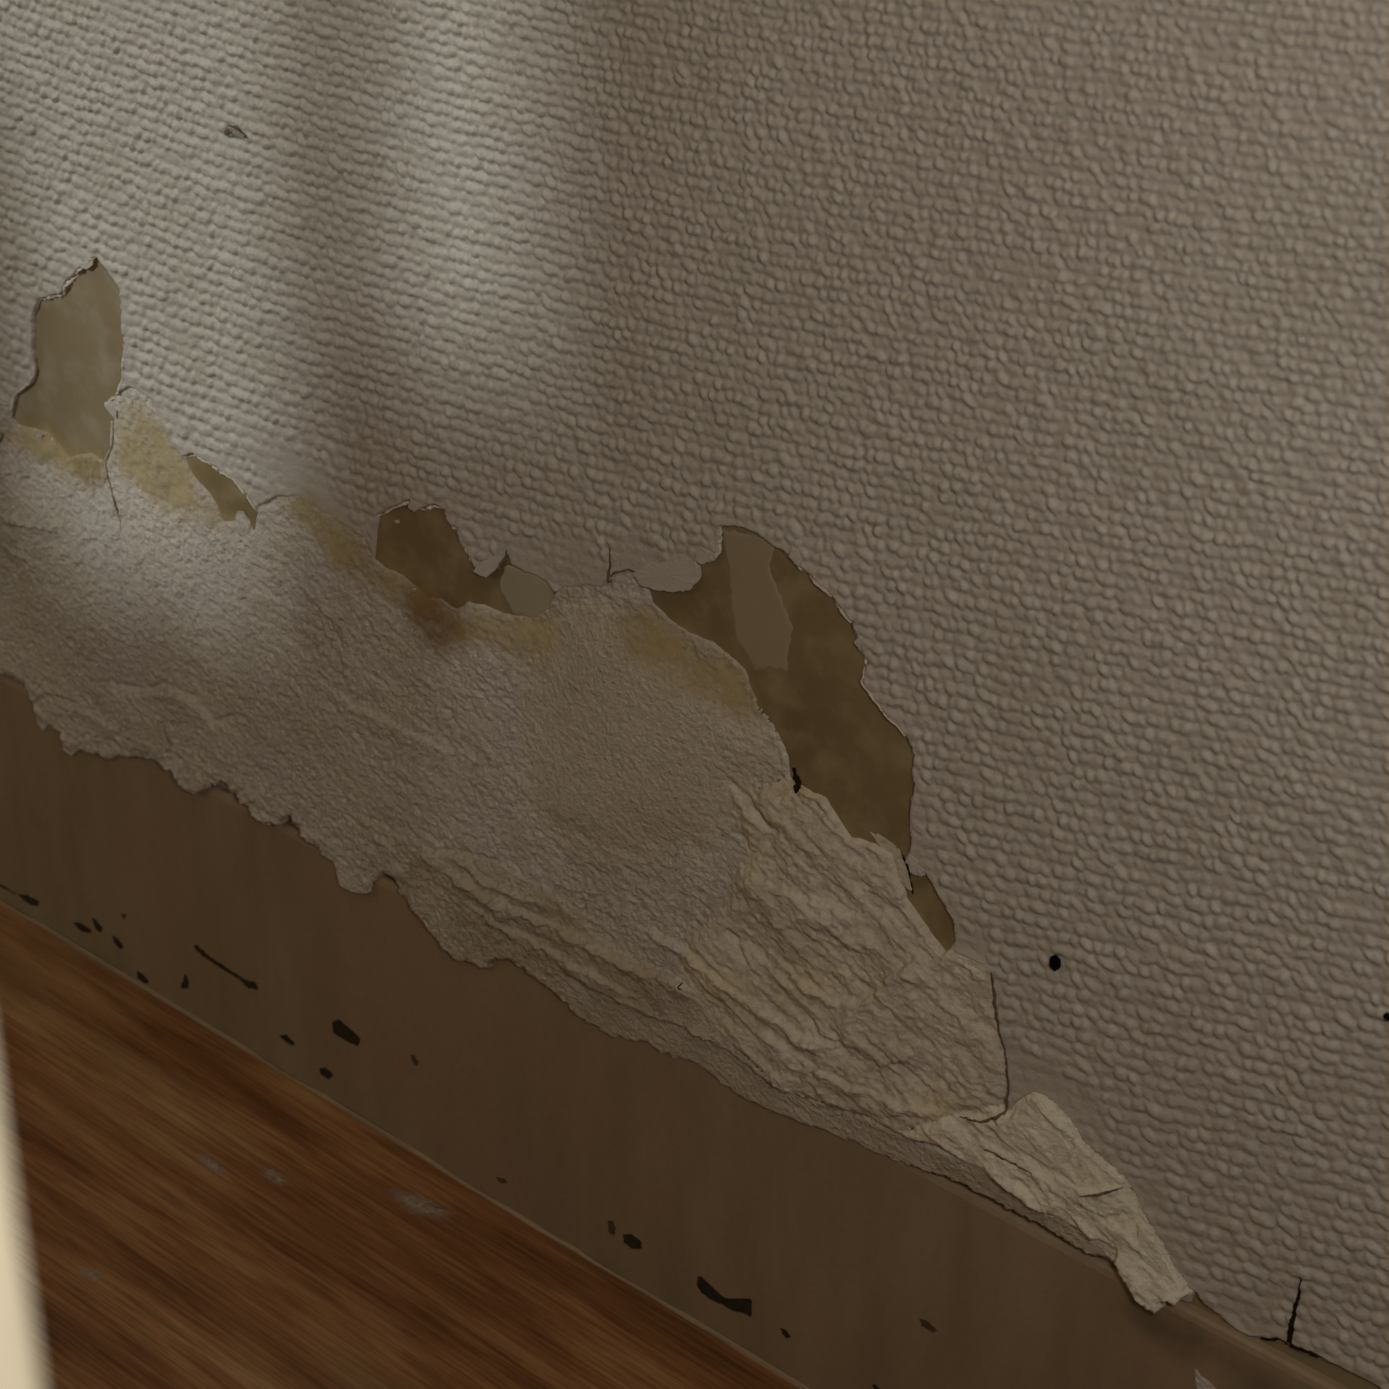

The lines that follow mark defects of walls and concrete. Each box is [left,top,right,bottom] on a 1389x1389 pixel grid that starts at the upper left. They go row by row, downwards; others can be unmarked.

peeling [0,257,124,599]
peeling [183,454,258,530]
peeling [375,499,554,618]
peeling [73,918,123,950]
spalling [395,526,1196,1317]
peeling [332,1019,361,1046]
crack [960,973,1032,1175]
crack [1079,1187,1123,1197]
crack [1261,1277,1319,1358]